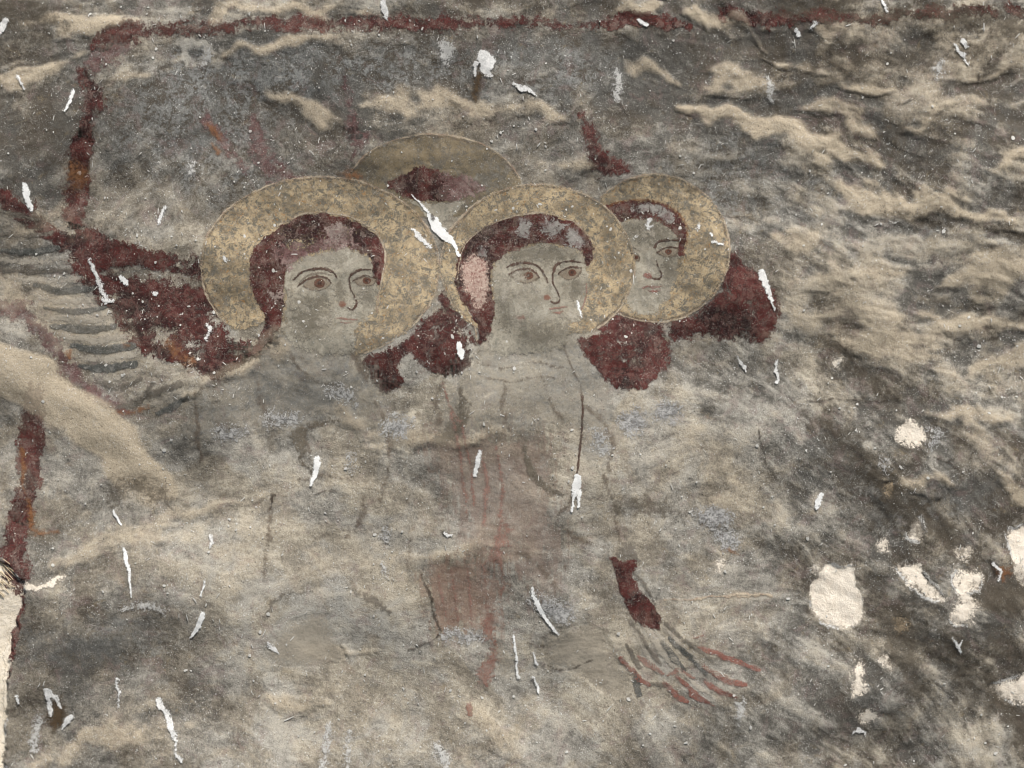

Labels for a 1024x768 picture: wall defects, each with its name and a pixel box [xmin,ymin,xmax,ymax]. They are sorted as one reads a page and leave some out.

spalling [895,418,927,448]
spalling [809,561,865,630]
spalling [893,524,1024,627]
spalling [0,559,66,768]
peeling [526,589,630,700]
spalling [847,652,895,698]
spalling [989,672,1024,705]